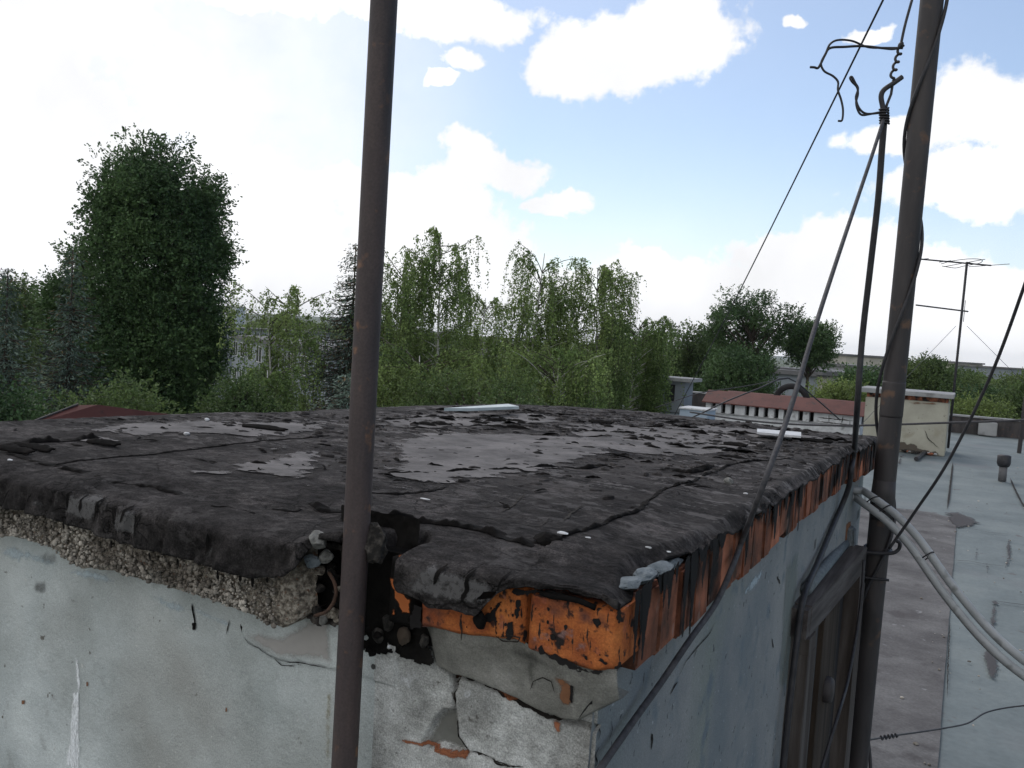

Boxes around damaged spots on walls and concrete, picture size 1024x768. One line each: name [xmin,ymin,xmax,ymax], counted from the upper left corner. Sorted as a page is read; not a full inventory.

peeling [69,416,349,486]
crack [372,414,786,546]
peeling [376,407,852,491]
spalling [370,510,420,557]
spalling [0,506,342,669]
peeling [485,588,623,675]
crack [453,675,613,767]